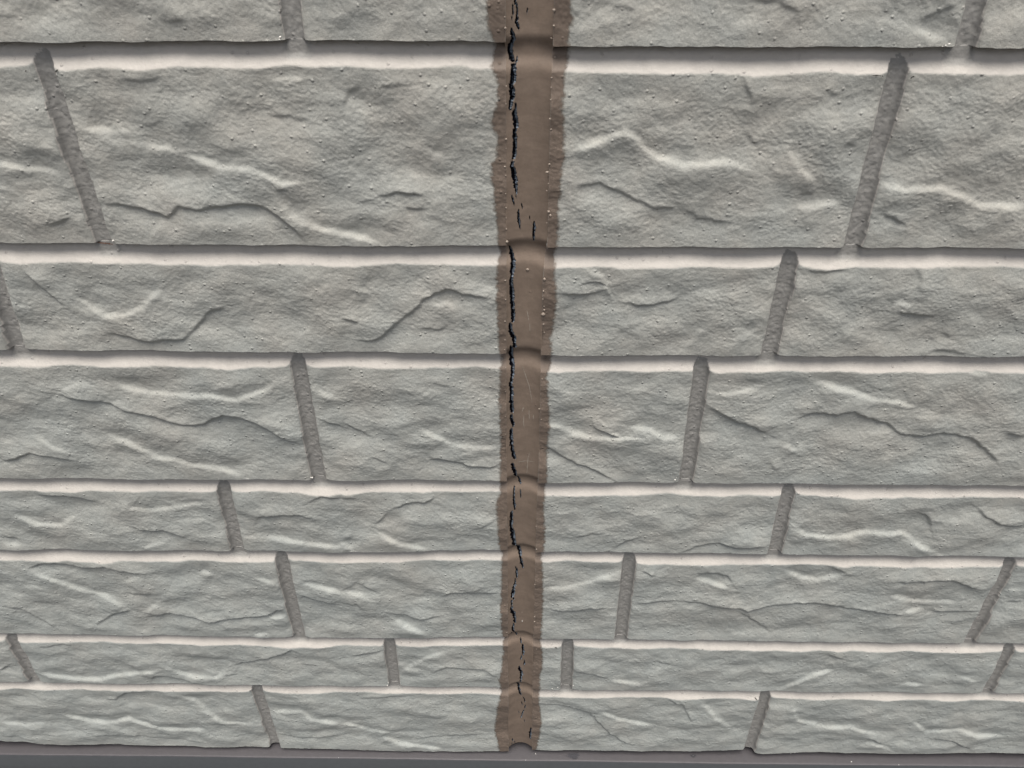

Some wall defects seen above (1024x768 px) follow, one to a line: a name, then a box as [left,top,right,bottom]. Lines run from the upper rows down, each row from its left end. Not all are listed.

crack [507,0,536,742]